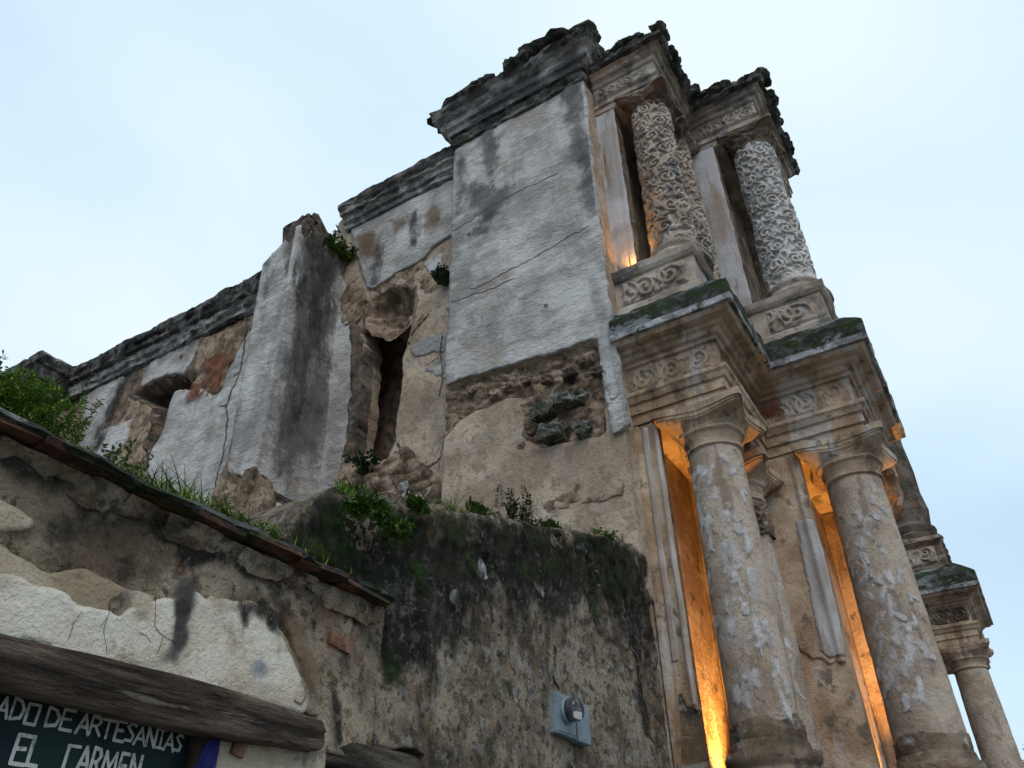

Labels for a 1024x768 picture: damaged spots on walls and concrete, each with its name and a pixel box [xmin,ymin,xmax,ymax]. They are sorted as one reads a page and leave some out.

leakage [456,129,510,234]
flaking render [179,325,250,396]
crack [215,314,248,486]
leakage [274,235,342,477]
flaking render [340,253,446,379]
crack [451,226,588,302]
flaking render [443,344,626,449]
flaking render [340,446,442,504]
crack [67,592,124,653]
crack [139,597,173,655]
leakage [167,543,251,660]
leakage [364,516,655,738]